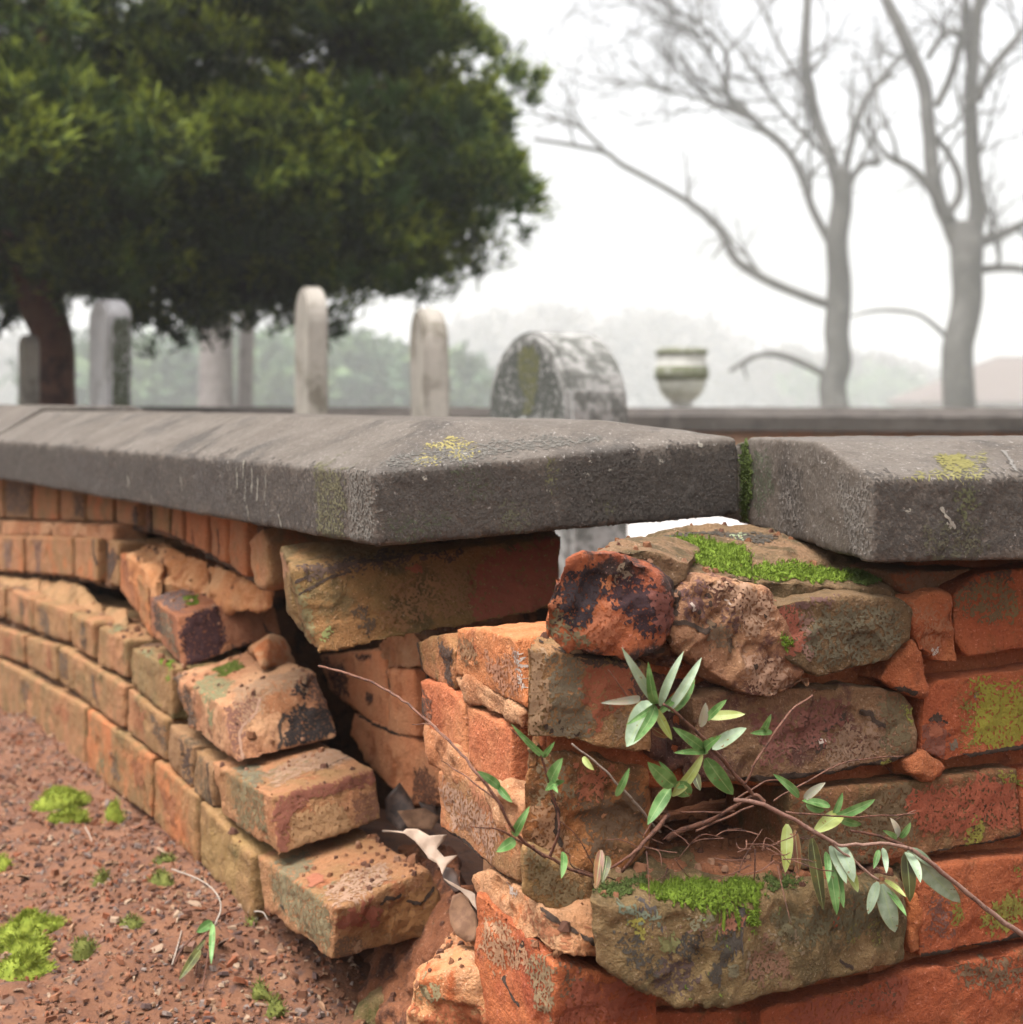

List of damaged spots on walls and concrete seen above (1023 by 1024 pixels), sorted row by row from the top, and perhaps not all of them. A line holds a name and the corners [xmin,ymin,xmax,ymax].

spalling [218,668,309,761]
crack [357,642,427,738]
spalling [571,575,643,738]
crack [380,886,435,906]